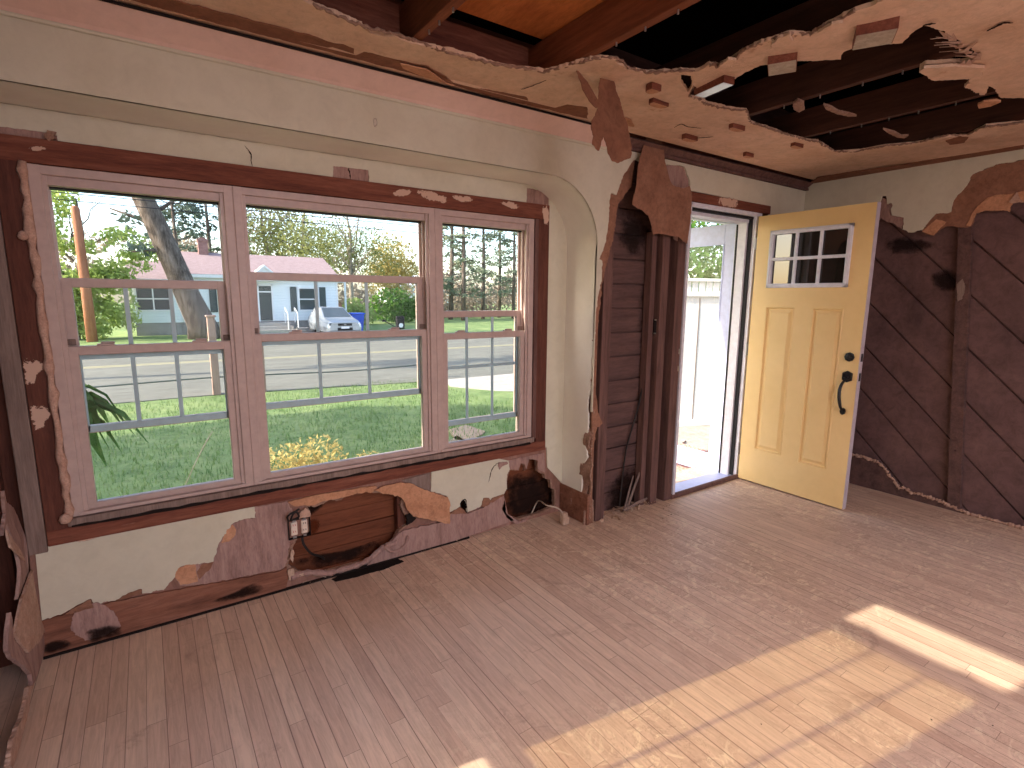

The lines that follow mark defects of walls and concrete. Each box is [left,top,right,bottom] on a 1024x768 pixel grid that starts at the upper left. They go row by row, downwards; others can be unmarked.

spalling [709,8,855,69]
spalling [919,63,985,81]
peeling [922,160,1024,236]
damp [888,238,931,253]
damp [933,271,956,290]
spalling [579,160,635,525]
peeling [175,473,468,586]
peeling [0,491,45,768]
damp [44,641,69,653]
peeling [63,589,142,641]
damp [87,626,120,641]
damp [217,585,259,601]